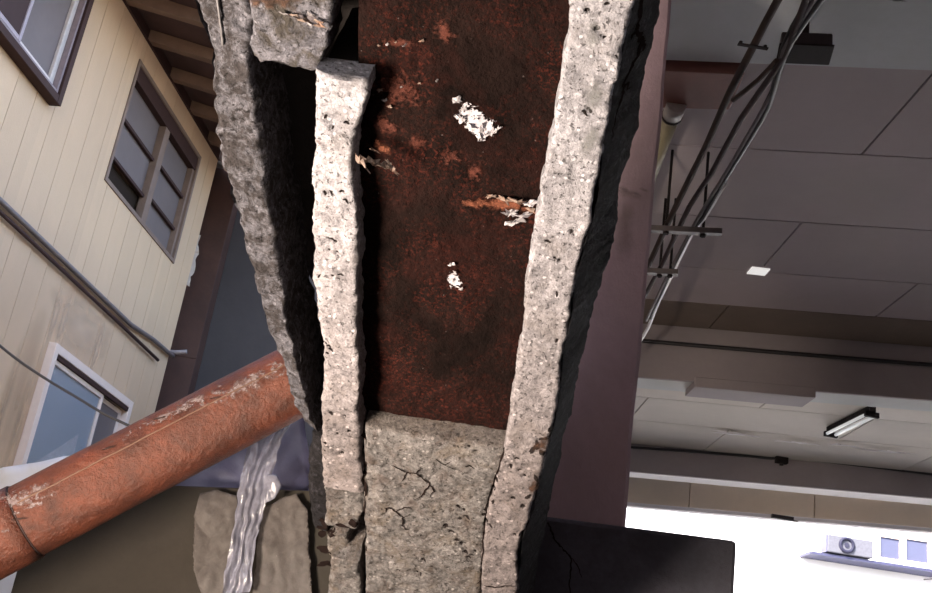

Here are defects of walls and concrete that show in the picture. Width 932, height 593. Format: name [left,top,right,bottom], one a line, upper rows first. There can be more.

rust [377,39,424,47]
rust [439,25,450,41]
rust [377,77,421,108]
peeling [452,96,503,142]
peeling [355,140,399,176]
rust [463,194,537,226]
peeling [447,262,463,291]
crack [361,416,460,535]